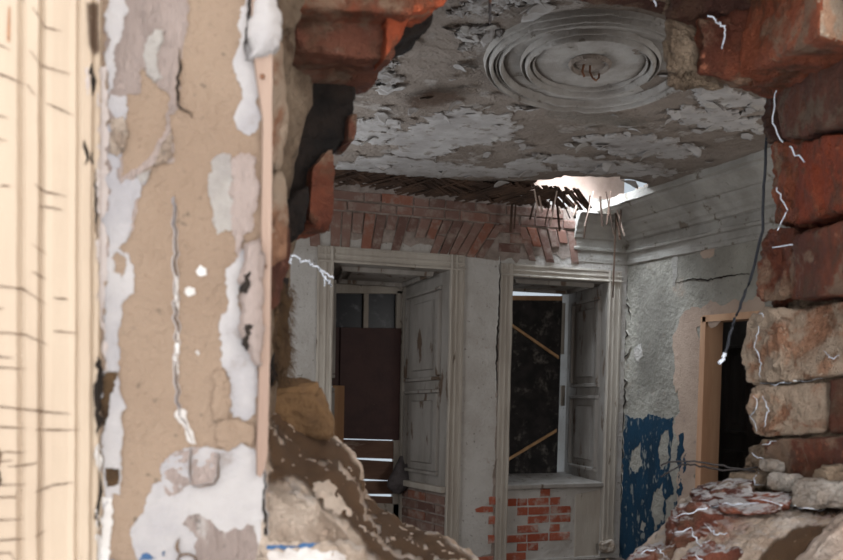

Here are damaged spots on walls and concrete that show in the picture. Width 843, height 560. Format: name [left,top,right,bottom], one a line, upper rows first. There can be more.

crack [175,48,194,119]
peeling [232,0,261,136]
peeling [371,55,406,95]
peeling [335,86,766,189]
peeling [82,0,190,560]
crack [171,197,196,444]
peeling [207,153,266,421]
flaking render [310,181,580,264]
crack [675,273,751,283]
peeling [130,338,499,560]
peeling [619,295,765,560]
spalling [671,492,843,560]